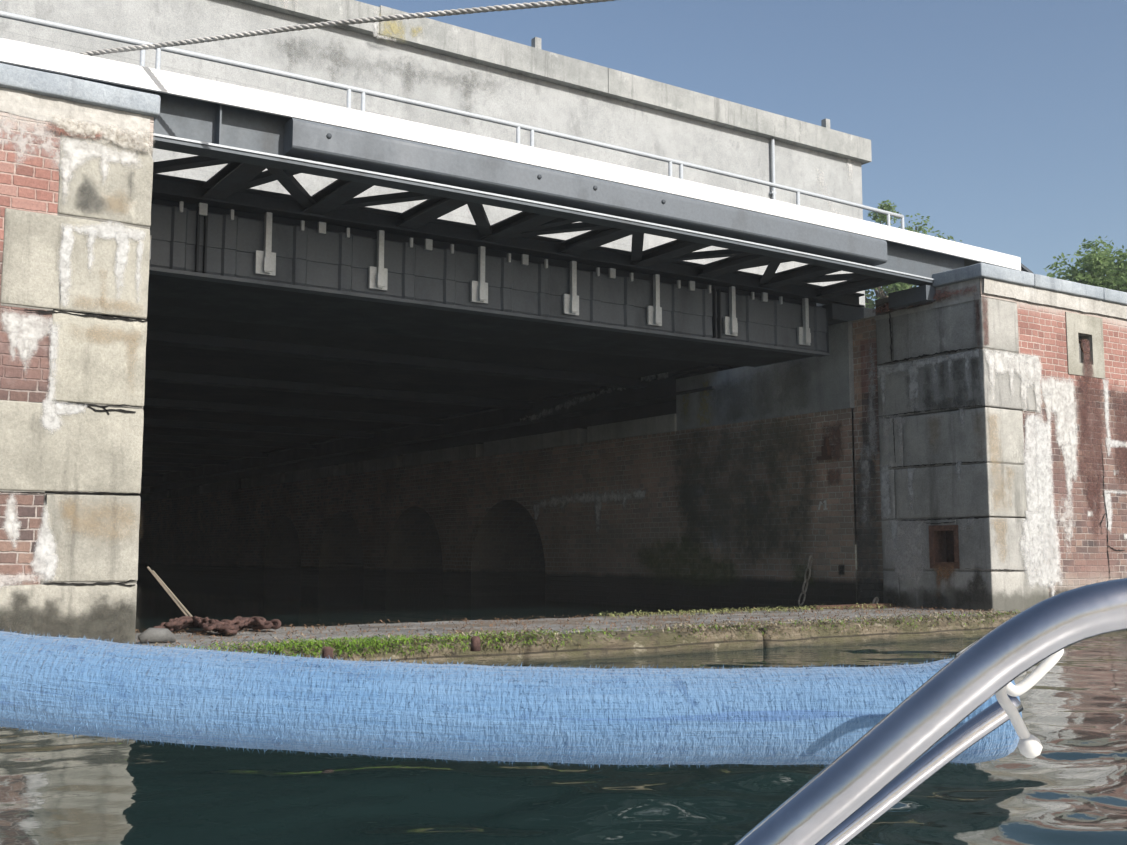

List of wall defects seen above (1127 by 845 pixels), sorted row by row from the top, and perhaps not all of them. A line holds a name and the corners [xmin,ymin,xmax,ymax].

damp [0,123,138,211]
damp [59,223,145,305]
damp [2,312,84,430]
crack [55,401,142,415]
damp [856,347,1127,601]